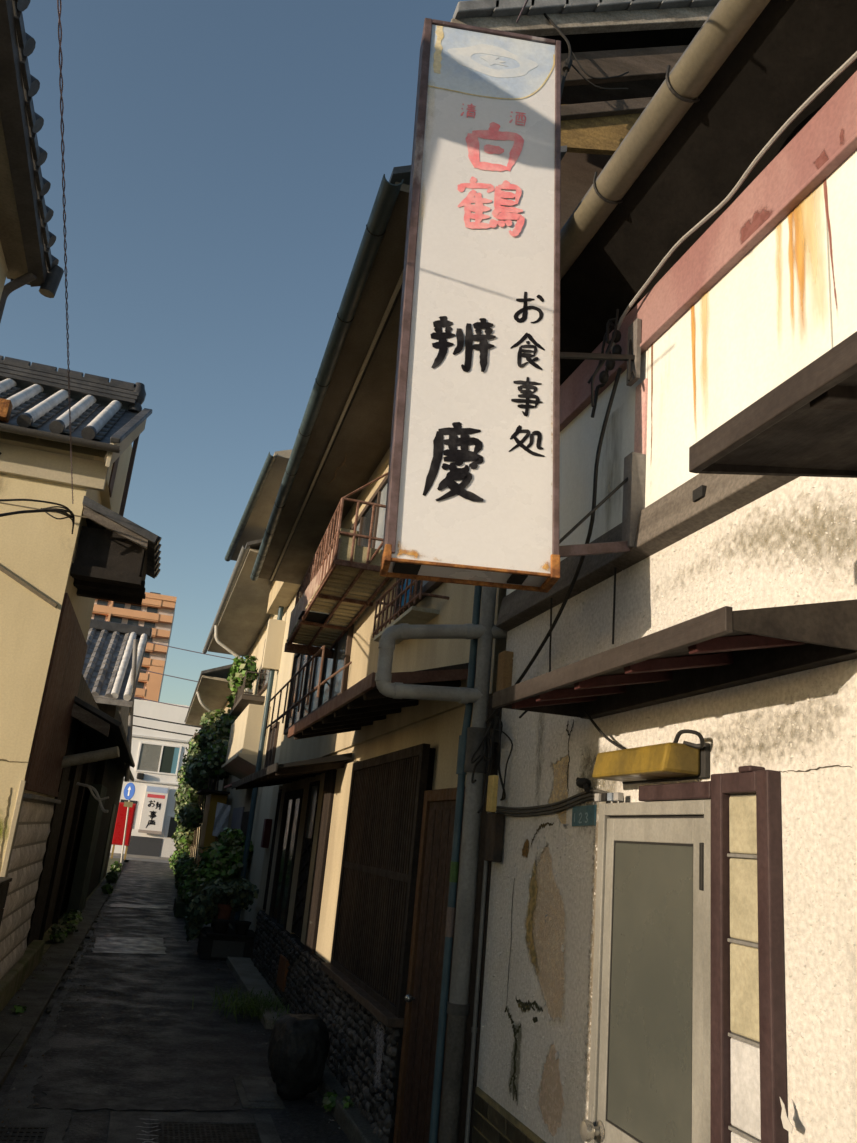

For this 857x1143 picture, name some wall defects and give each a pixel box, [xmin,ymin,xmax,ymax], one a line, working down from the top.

corrosion [778,179,837,319]
corrosion [691,293,707,412]
crack [0,789,11,866]
peeling [548,756,569,829]
crack [779,765,852,773]
peeling [525,842,565,1023]
peeling [538,1044,564,1136]